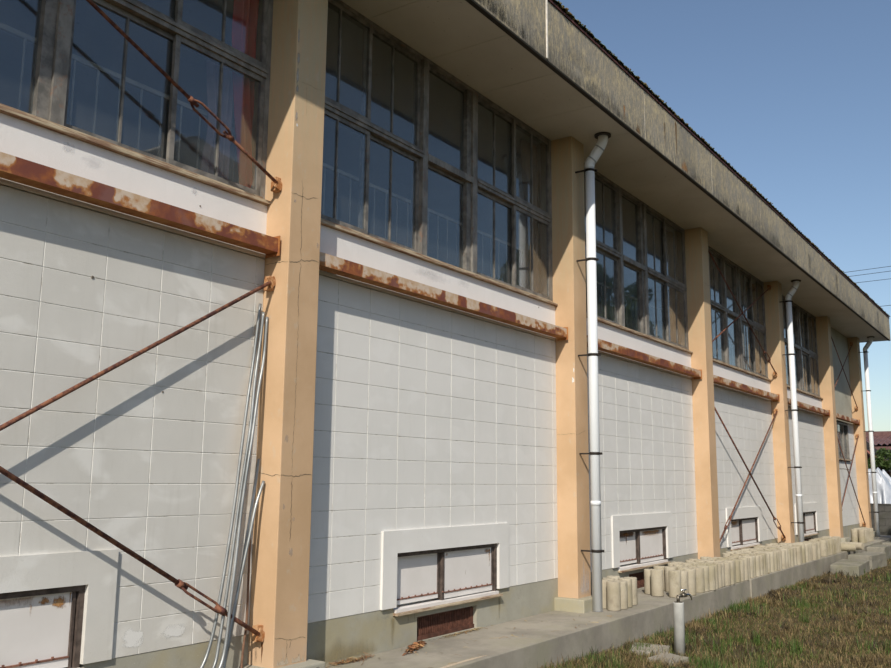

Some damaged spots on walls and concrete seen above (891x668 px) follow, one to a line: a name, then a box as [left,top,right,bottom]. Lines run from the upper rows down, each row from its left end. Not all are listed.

crack [261,185,319,537]
rust [39,593,71,607]